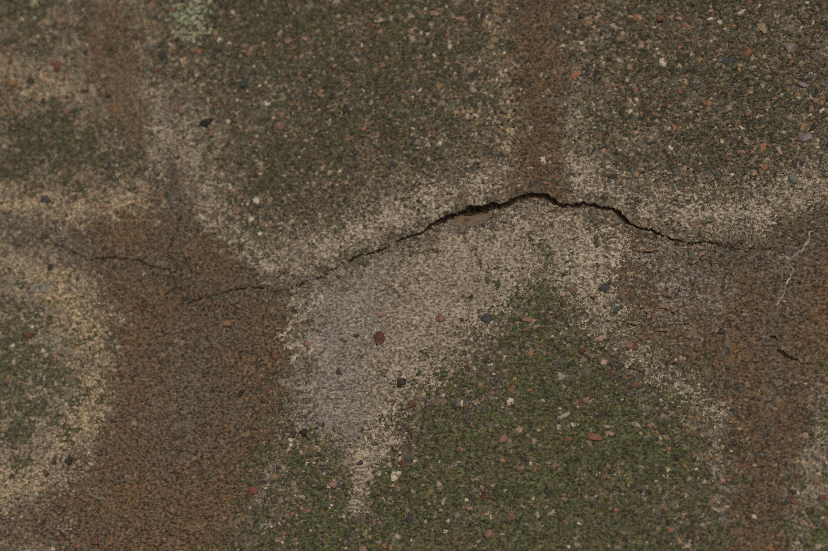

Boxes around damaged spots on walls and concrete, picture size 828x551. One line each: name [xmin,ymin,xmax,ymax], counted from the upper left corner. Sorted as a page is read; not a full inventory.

crack [21,180,828,551]